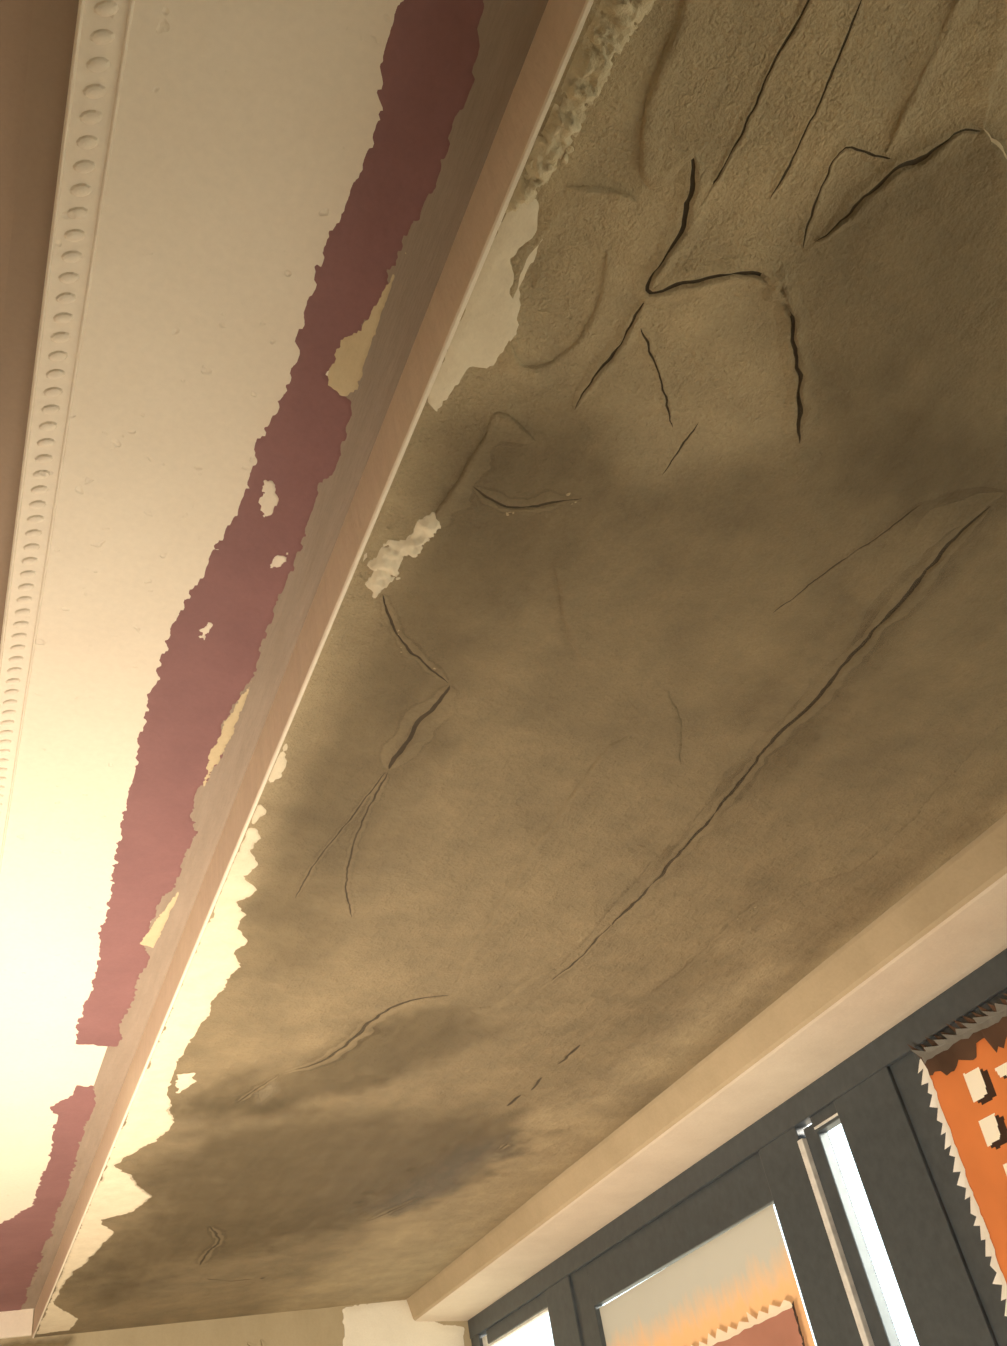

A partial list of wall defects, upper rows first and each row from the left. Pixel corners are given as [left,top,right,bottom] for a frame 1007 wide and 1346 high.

peeling [428,0,656,411]
crack [571,0,982,475]
peeling [75,0,484,1047]
crack [235,487,1004,1103]
peeling [36,805,266,1334]